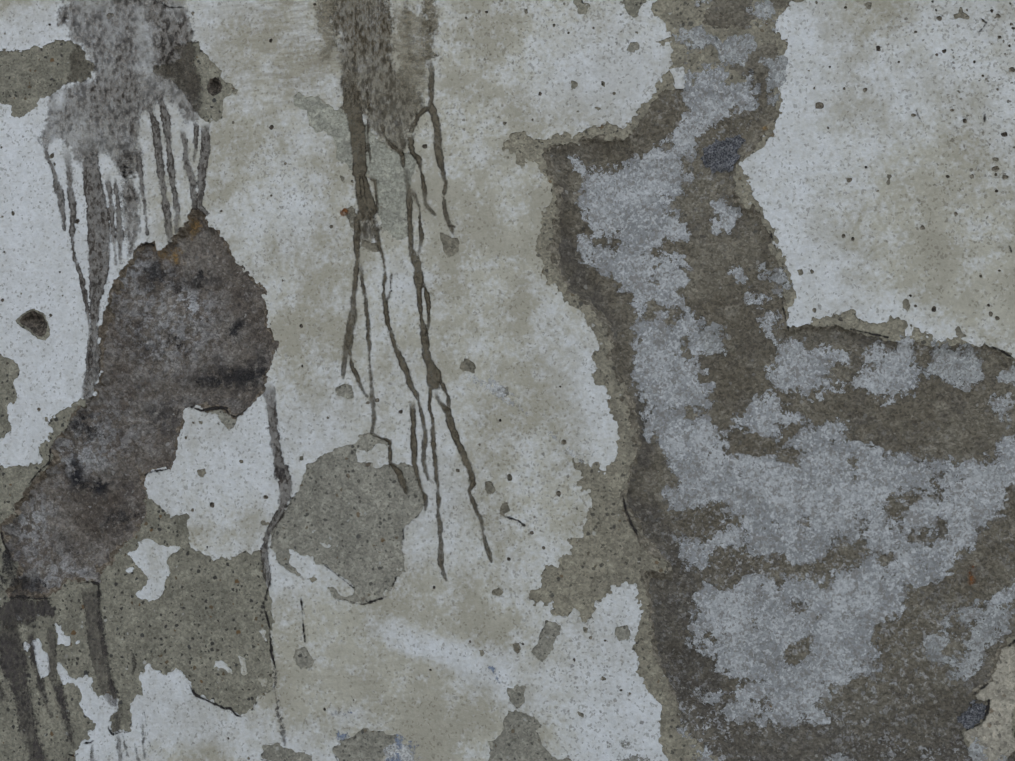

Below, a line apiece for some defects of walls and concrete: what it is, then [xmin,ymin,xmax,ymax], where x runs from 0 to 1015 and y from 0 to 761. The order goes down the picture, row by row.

peeling [0,40,94,118]
damp [40,0,211,403]
damp [315,0,493,581]
flaking render [502,0,1015,761]
damp [0,595,74,761]
damp [82,594,116,700]
crack [263,581,276,668]
peeling [488,684,572,761]